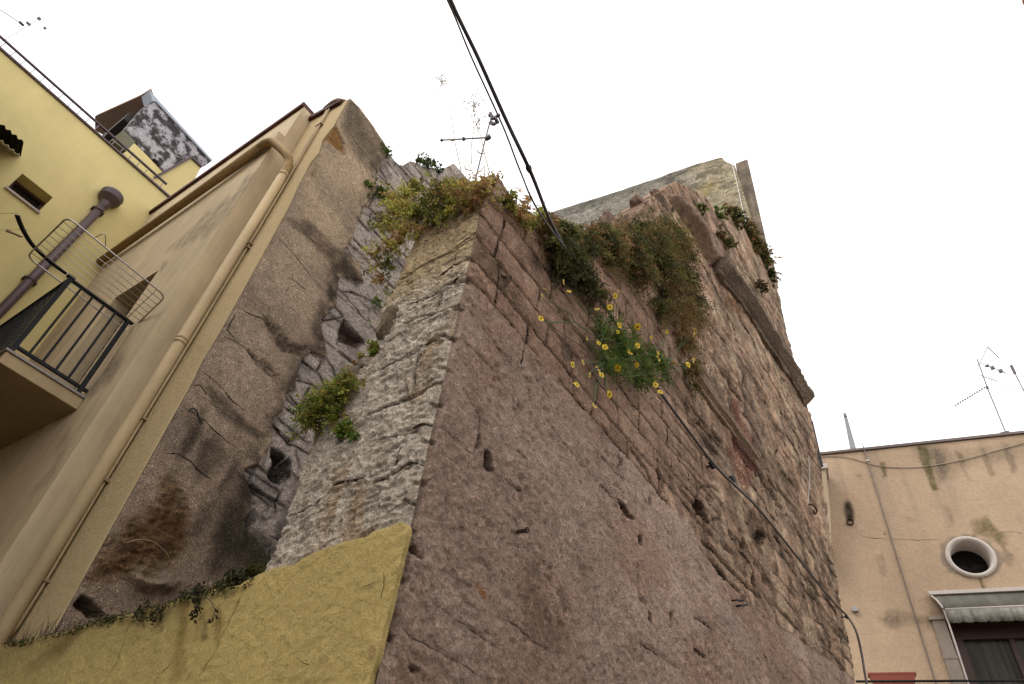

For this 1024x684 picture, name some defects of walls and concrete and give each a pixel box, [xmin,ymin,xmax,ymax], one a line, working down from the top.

crack [223,309,273,378]
crack [185,372,260,453]
crack [166,453,214,482]